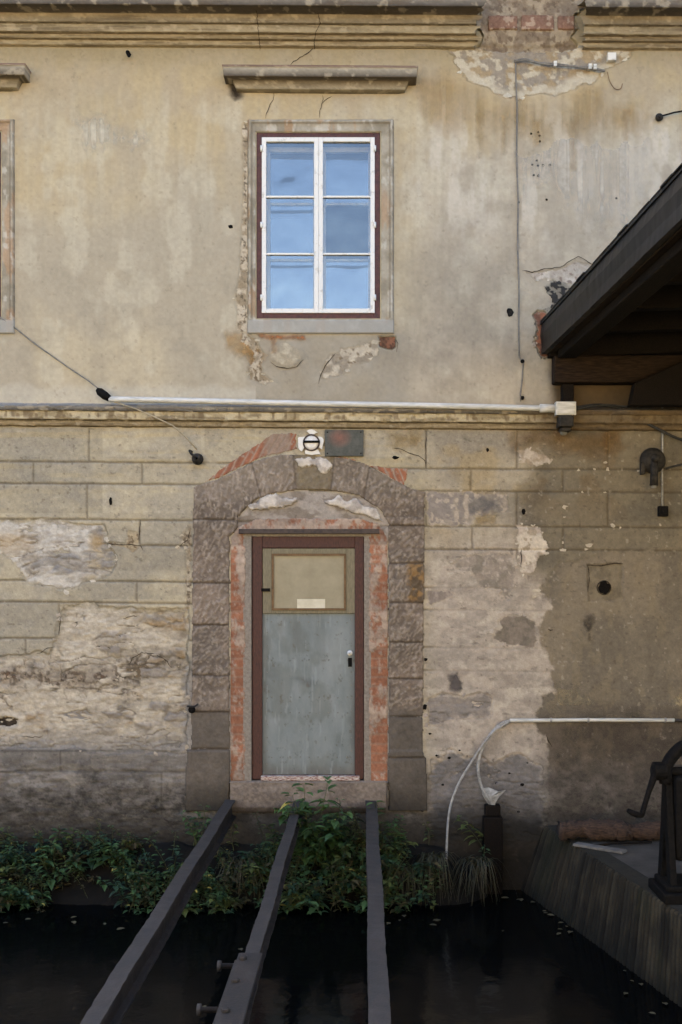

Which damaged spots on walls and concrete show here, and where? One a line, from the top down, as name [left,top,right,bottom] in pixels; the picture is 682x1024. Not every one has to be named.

peeling [450,0,632,100]
leakage [539,139,626,216]
peeling [232,121,274,385]
peeling [523,256,591,284]
peeling [318,337,398,384]
peeling [517,447,553,467]
peeling [449,523,566,600]
spalling [0,518,193,756]
peeling [489,614,538,648]
spalling [423,674,492,735]
spalling [425,749,548,847]